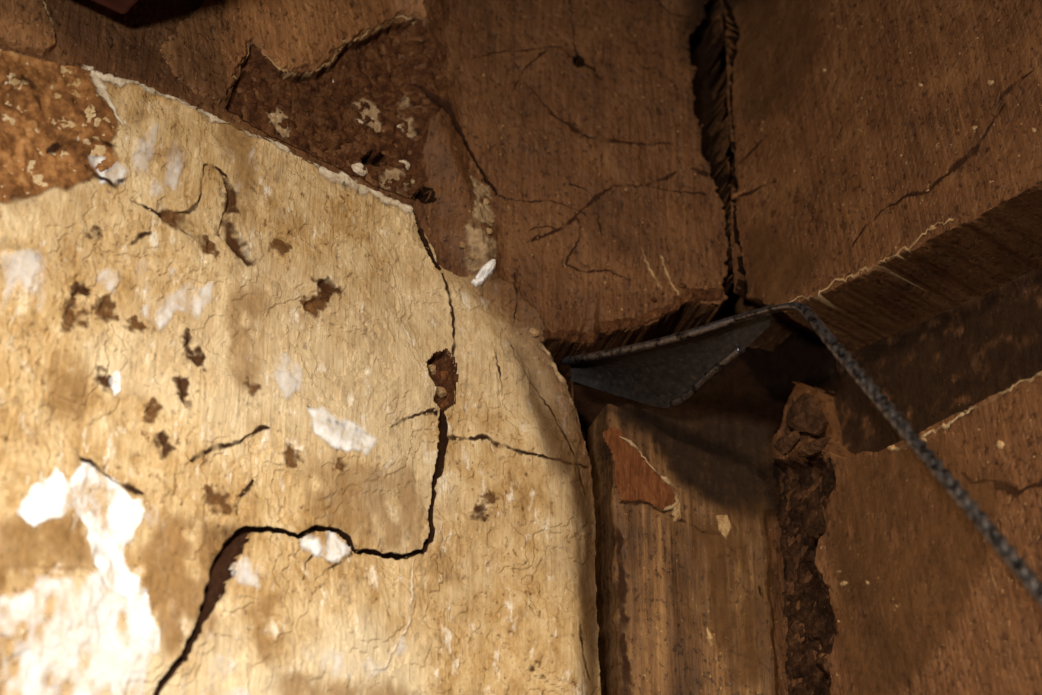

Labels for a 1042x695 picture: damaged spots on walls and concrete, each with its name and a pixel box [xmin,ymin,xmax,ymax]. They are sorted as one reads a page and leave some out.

spalling [161,209,185,232]
crack [131,164,227,244]
spalling [0,0,448,212]
spalling [201,171,253,266]
crack [413,212,455,356]
spalling [459,176,497,286]
crack [412,0,777,322]
crack [153,408,588,695]
peeling [603,427,681,522]
peeling [716,514,732,539]
spalling [767,452,848,695]
crack [579,626,590,680]